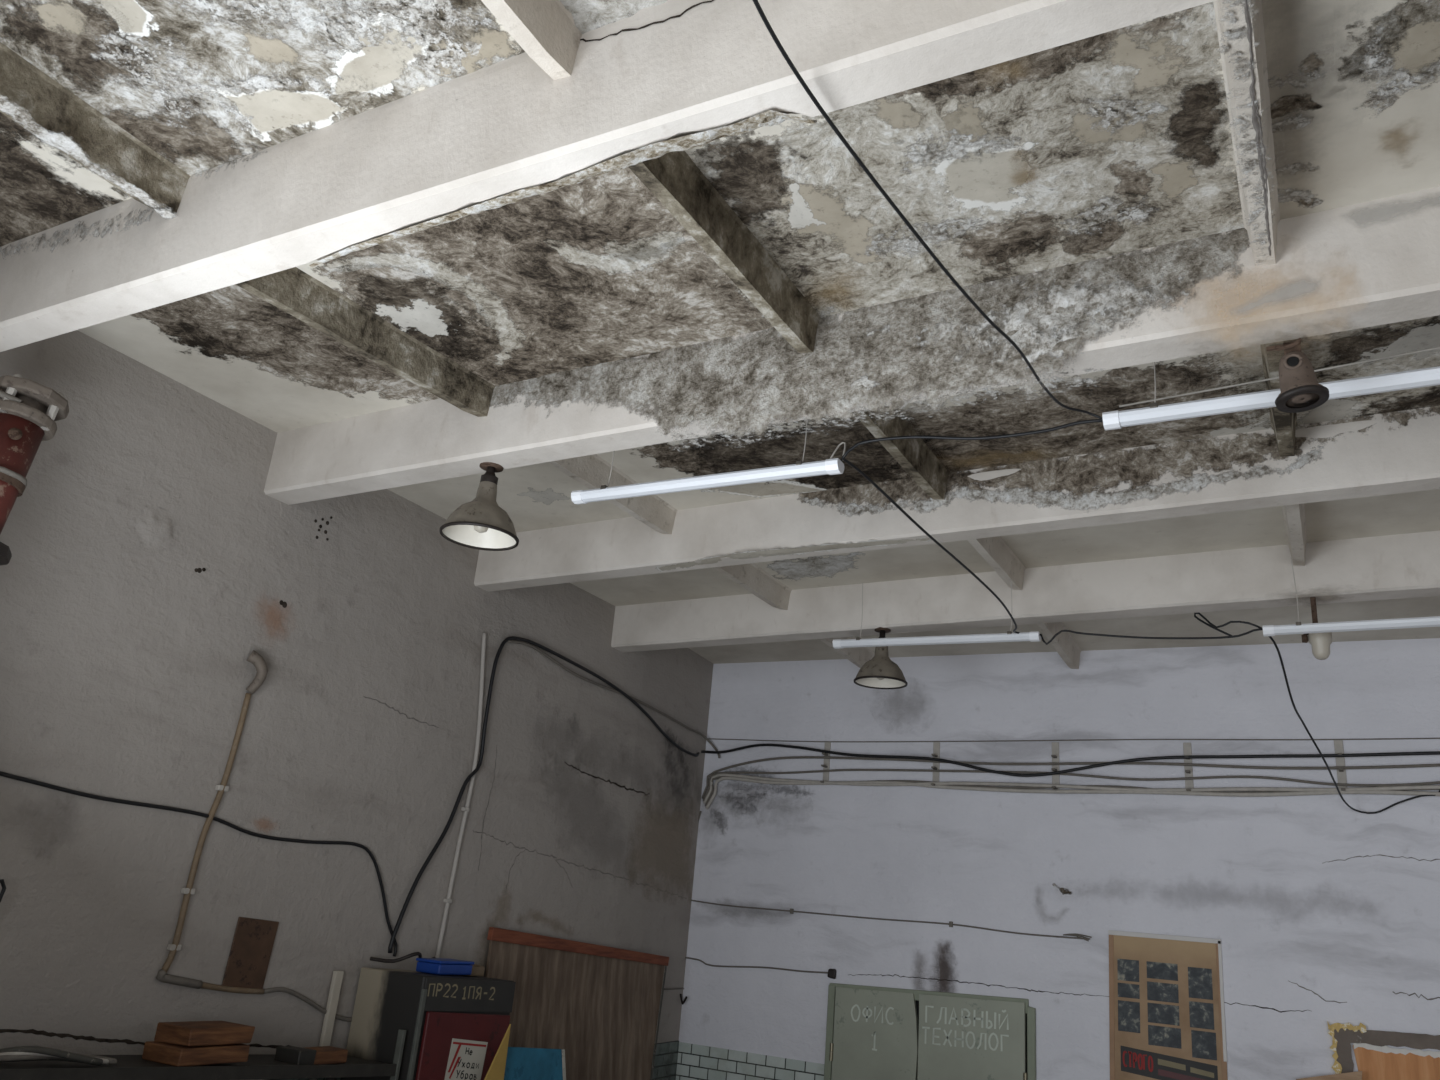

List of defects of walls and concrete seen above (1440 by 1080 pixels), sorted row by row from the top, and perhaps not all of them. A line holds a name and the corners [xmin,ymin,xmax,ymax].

peeling [32,1,88,35]
peeling [100,0,159,38]
peeling [208,10,519,142]
peeling [876,97,1039,211]
spalling [308,110,817,267]
peeling [1359,323,1440,371]
peeling [1297,399,1365,424]
crack [473,747,686,899]
crack [1324,854,1440,863]
crack [1393,992,1440,1000]